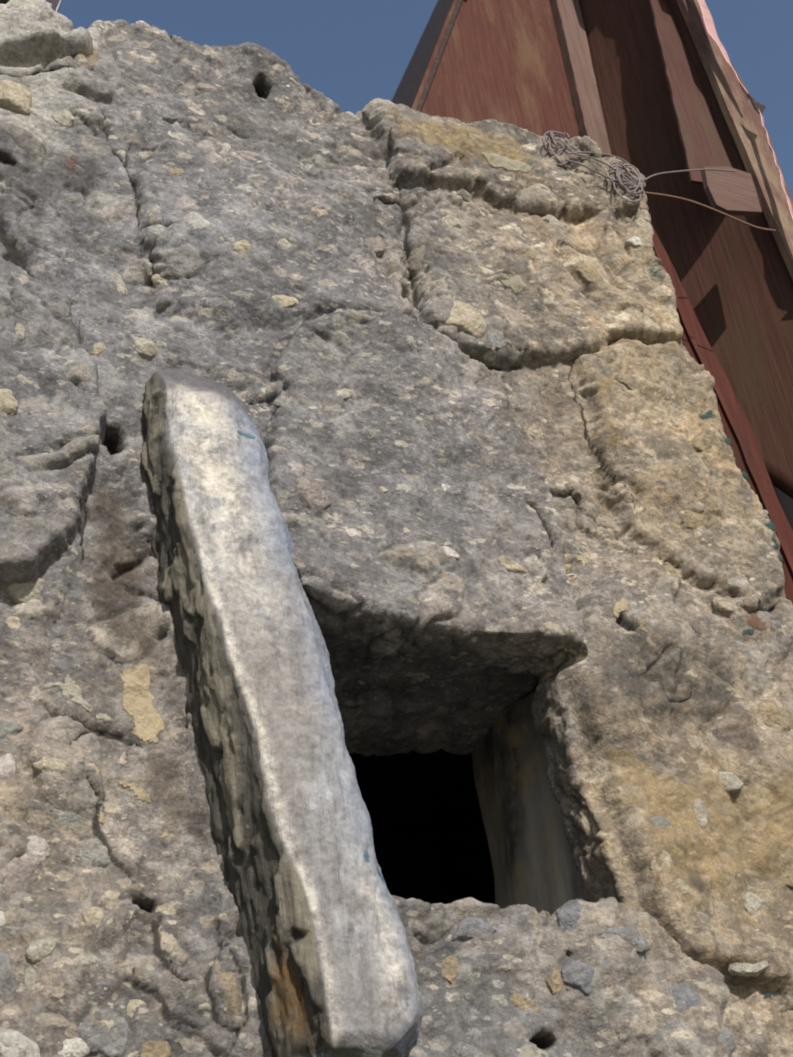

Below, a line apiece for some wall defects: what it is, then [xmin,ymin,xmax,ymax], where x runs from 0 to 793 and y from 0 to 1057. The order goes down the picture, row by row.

crack [0,225,32,277]
crack [101,109,168,285]
crack [382,130,423,313]
crack [568,367,635,508]
crack [79,500,87,561]
crack [92,789,134,883]
crack [132,915,250,1057]